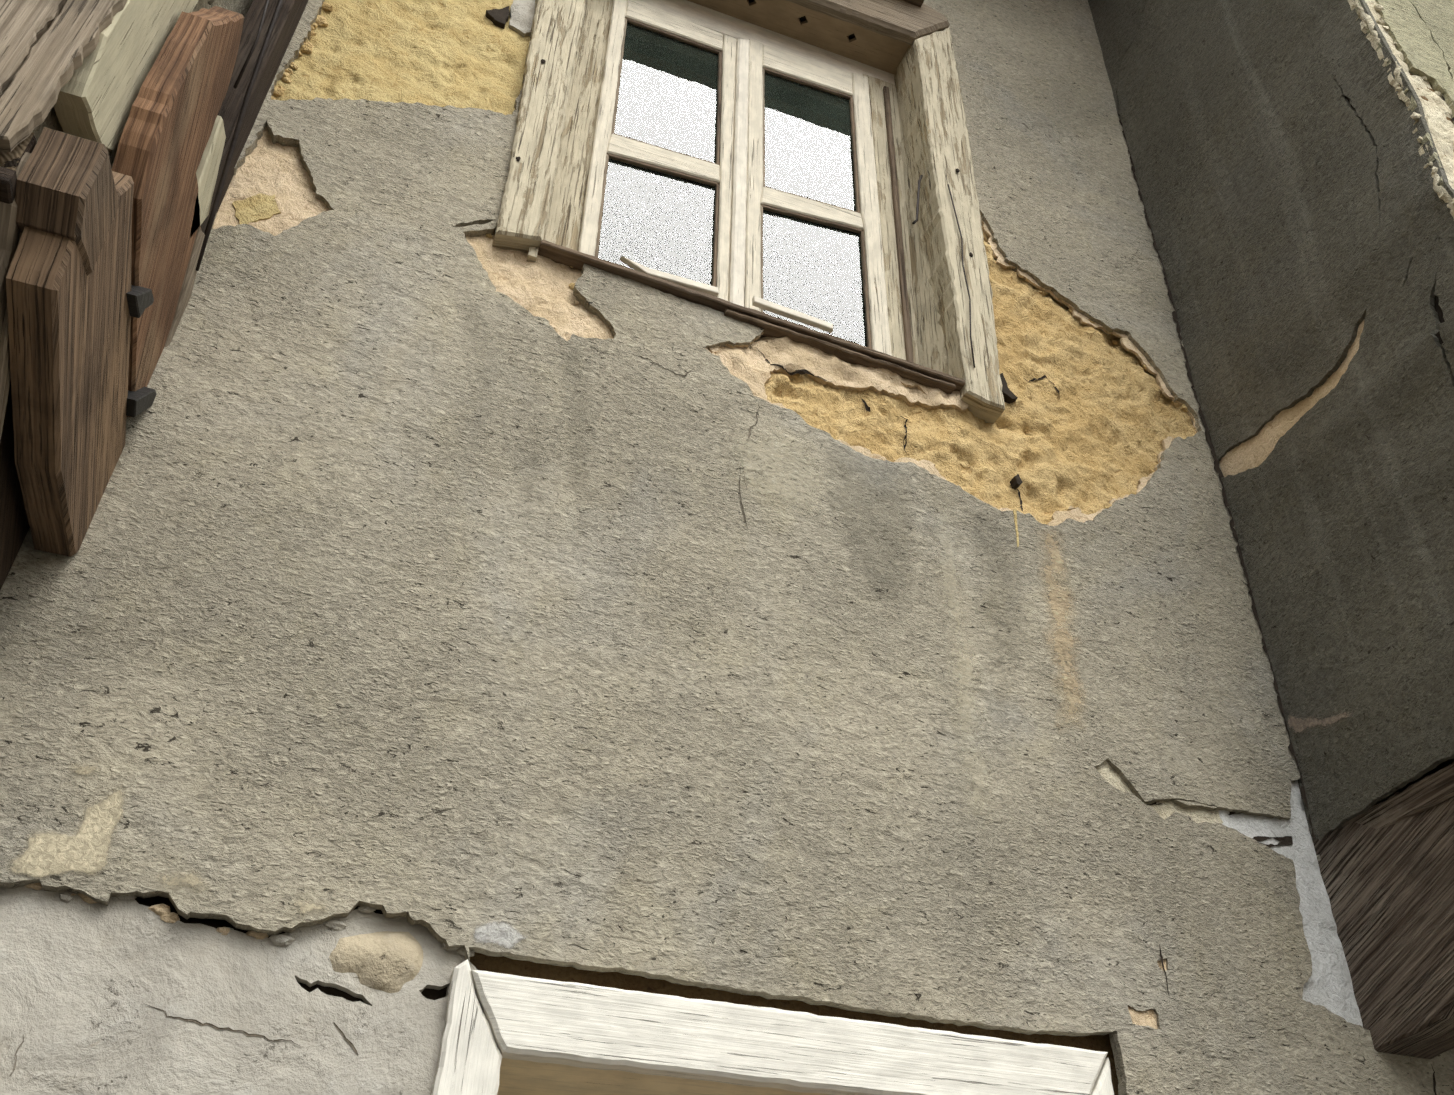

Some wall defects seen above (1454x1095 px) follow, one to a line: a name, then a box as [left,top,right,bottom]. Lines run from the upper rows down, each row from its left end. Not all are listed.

flaking render [271,0,536,115]
peeling [1348,0,1454,218]
peeling [213,127,329,236]
peeling [465,232,614,341]
crack [1434,296,1445,344]
flaking render [705,217,1198,526]
crack [25,883,406,946]
crack [442,942,475,957]
crack [146,1004,303,1047]
crack [297,977,365,1054]
crack [421,987,447,1000]